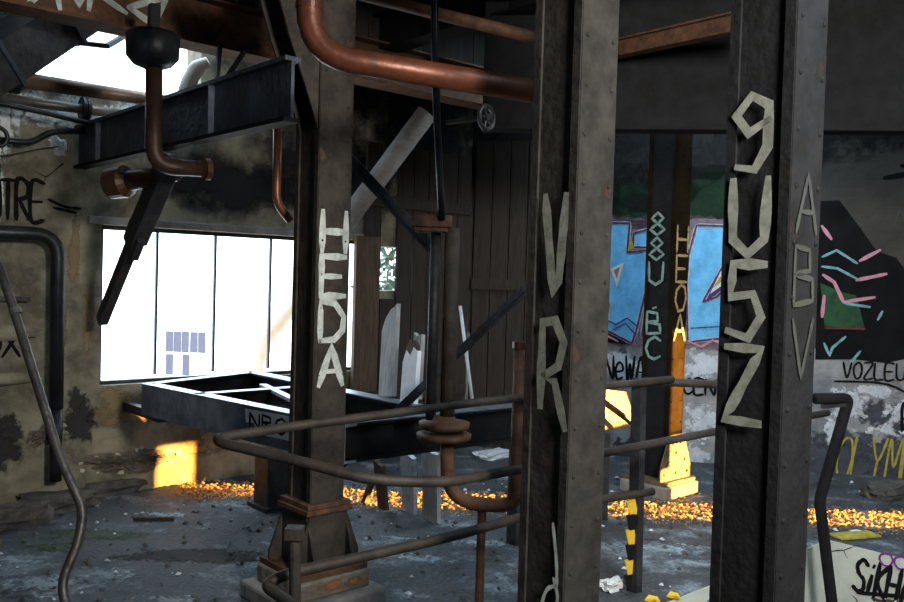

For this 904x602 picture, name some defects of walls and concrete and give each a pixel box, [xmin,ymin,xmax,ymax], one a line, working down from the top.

leakage [0,413,24,472]
peeling [810,407,840,472]
peeling [830,385,904,478]